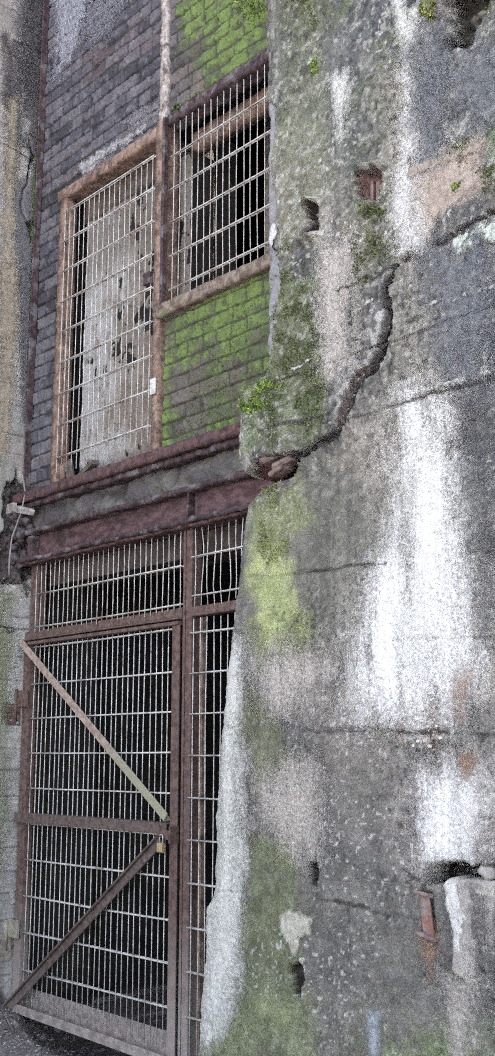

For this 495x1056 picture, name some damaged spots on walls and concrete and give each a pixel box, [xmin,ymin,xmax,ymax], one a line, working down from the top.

water stain [389,0,495,249]
crack [434,209,495,247]
water stain [423,250,493,362]
crack [264,251,495,489]
spalling [257,454,300,482]
spalling [0,478,35,601]
water stain [352,388,487,733]
water stain [419,760,492,874]
water stain [444,878,465,951]
peeling [445,874,495,983]
water stain [368,1014,378,1056]
efflorescence [445,975,479,1056]